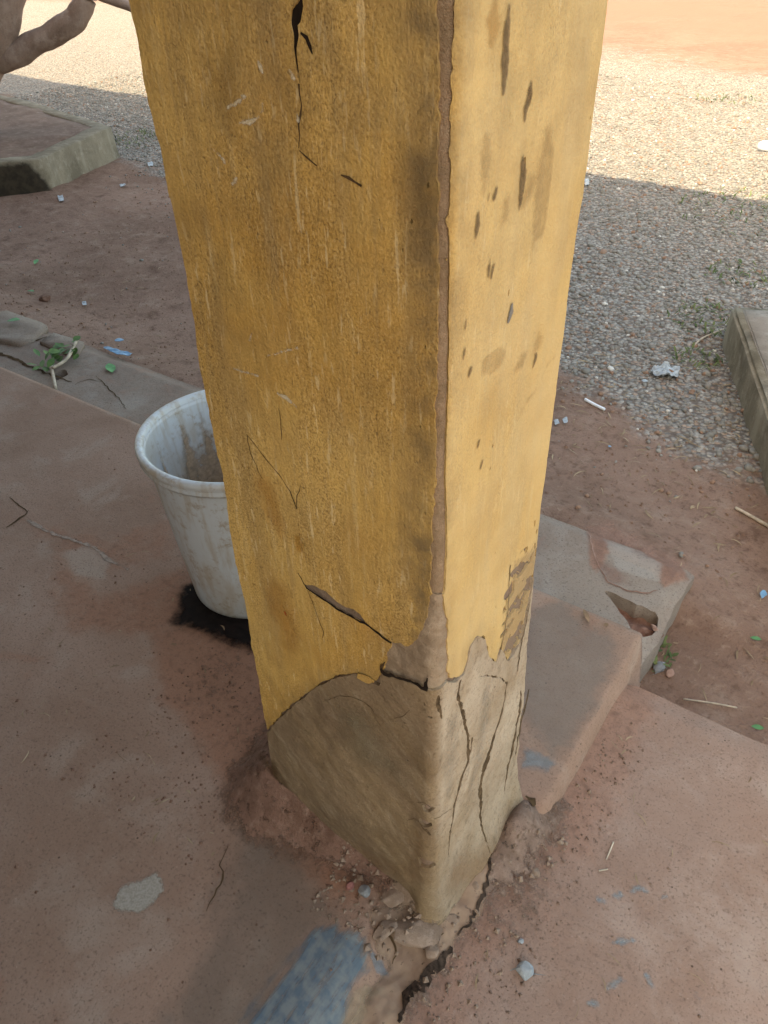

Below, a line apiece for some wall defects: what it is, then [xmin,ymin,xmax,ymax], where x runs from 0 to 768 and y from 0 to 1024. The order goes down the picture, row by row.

crack [292,0,317,166]
crack [341,175,362,187]
crack [298,574,391,644]
spalling [357,592,448,692]
crack [397,565,536,1023]